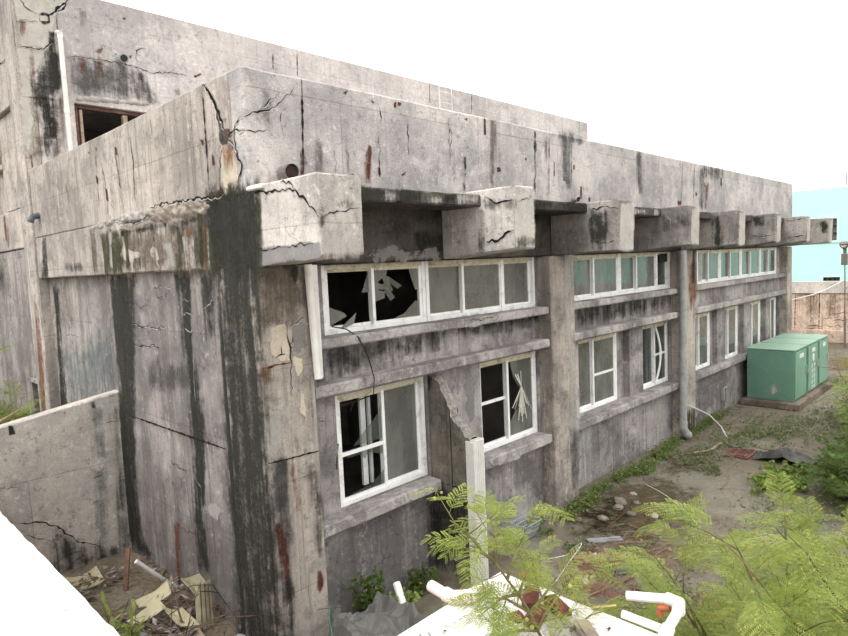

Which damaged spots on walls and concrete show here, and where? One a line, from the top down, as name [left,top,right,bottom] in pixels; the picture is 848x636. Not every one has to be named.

crack [17,0,73,23]
damp [31,32,63,155]
damp [72,59,152,103]
crack [67,48,356,226]
peeling [219,122,238,189]
corrosion [366,146,381,179]
crack [256,242,311,251]
crack [486,230,514,244]
damp [619,202,635,251]
peeling [270,324,303,376]
damp [53,178,310,636]
peeling [465,370,474,421]